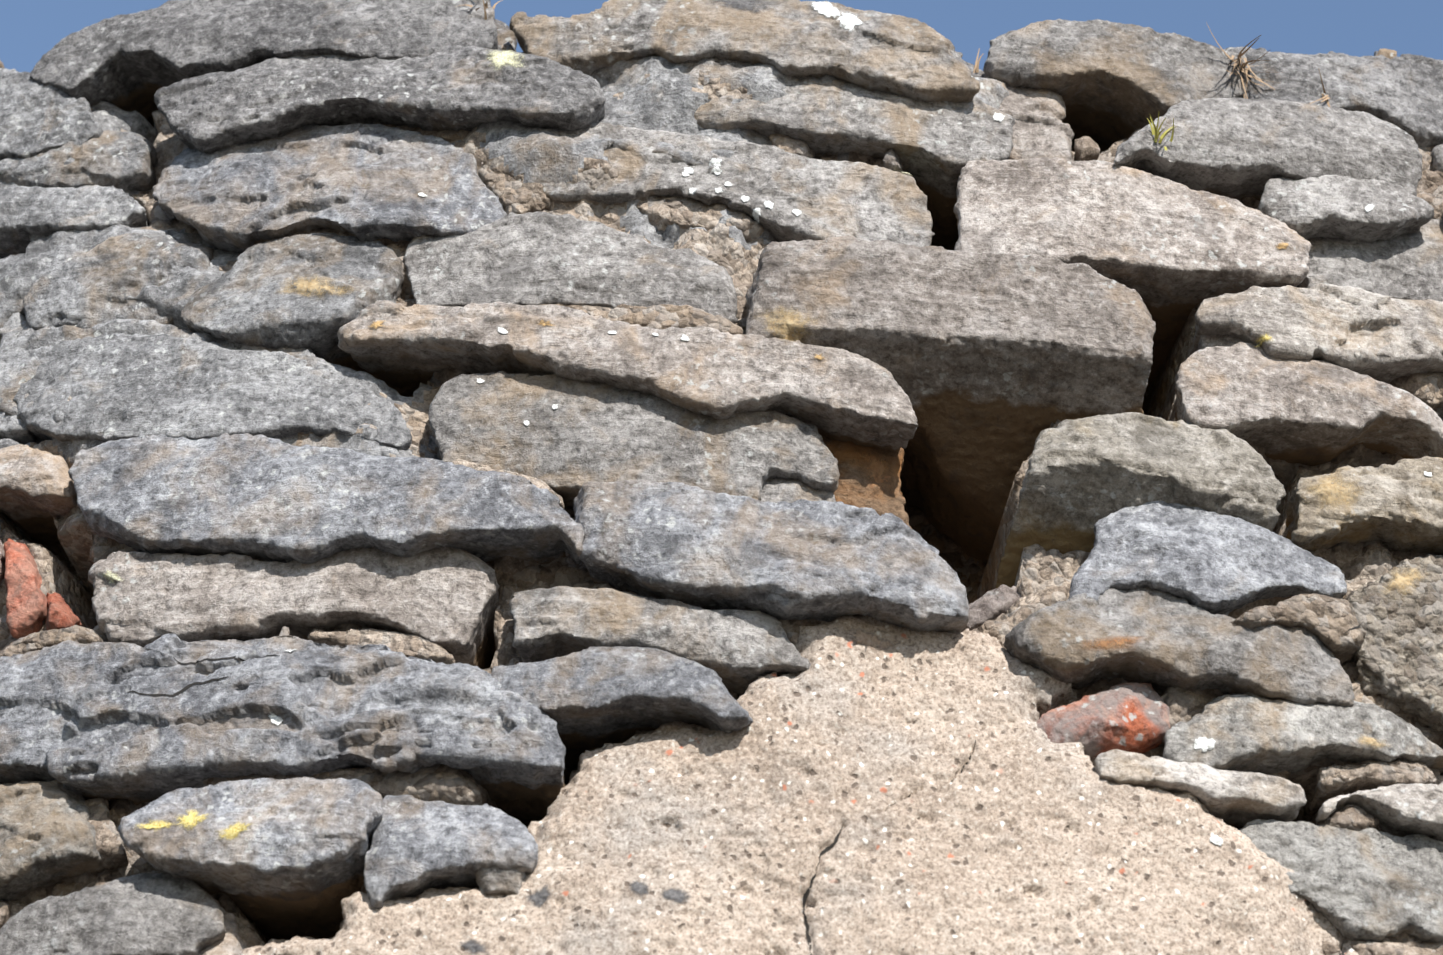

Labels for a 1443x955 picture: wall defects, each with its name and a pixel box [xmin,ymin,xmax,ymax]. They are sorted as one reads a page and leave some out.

crack [802,828,842,955]